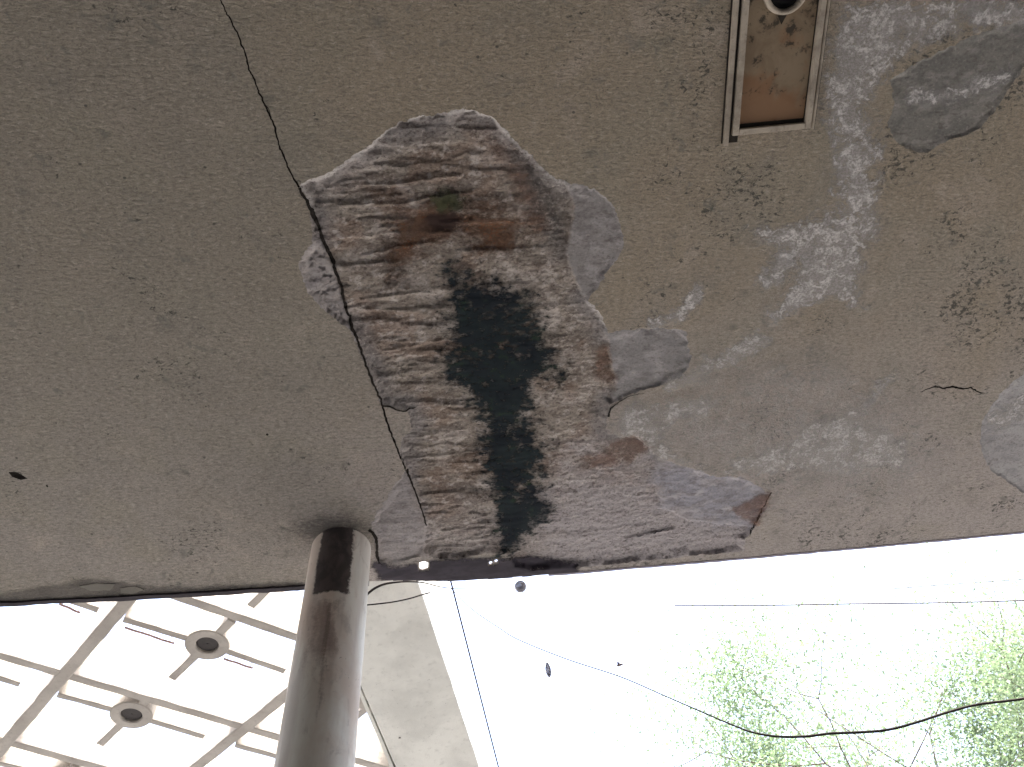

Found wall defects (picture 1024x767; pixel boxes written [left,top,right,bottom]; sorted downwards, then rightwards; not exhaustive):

flaking render [887,21,1024,153]
water stain [756,0,1024,324]
crack [220,0,427,526]
corrosion [382,188,535,280]
water stain [370,257,579,582]
flaking render [298,108,772,570]
water stain [647,285,703,329]
water stain [619,329,772,463]
water stain [726,377,906,474]
crack [922,386,985,394]